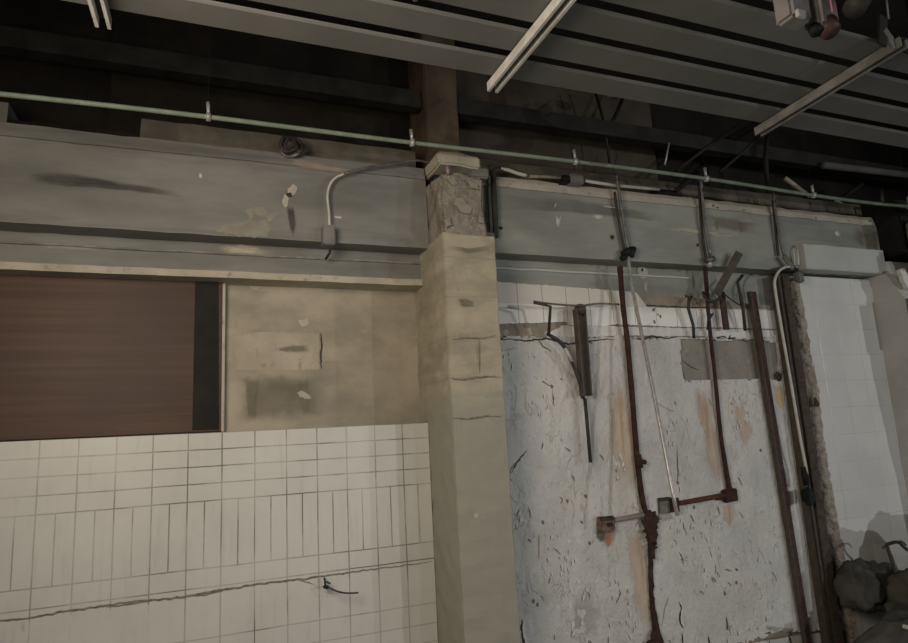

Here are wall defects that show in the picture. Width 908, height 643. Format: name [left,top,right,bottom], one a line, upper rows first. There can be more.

leakage [46,176,152,192]
spalling [214,184,297,238]
flaking render [500,325,560,339]
crack [452,335,678,380]
flaking render [681,342,775,380]
crack [457,413,501,421]
rust [614,396,634,473]
rust [698,403,719,468]
spalling [791,281,845,578]
crack [0,561,431,622]
rust [630,538,649,615]
crack [519,619,527,643]